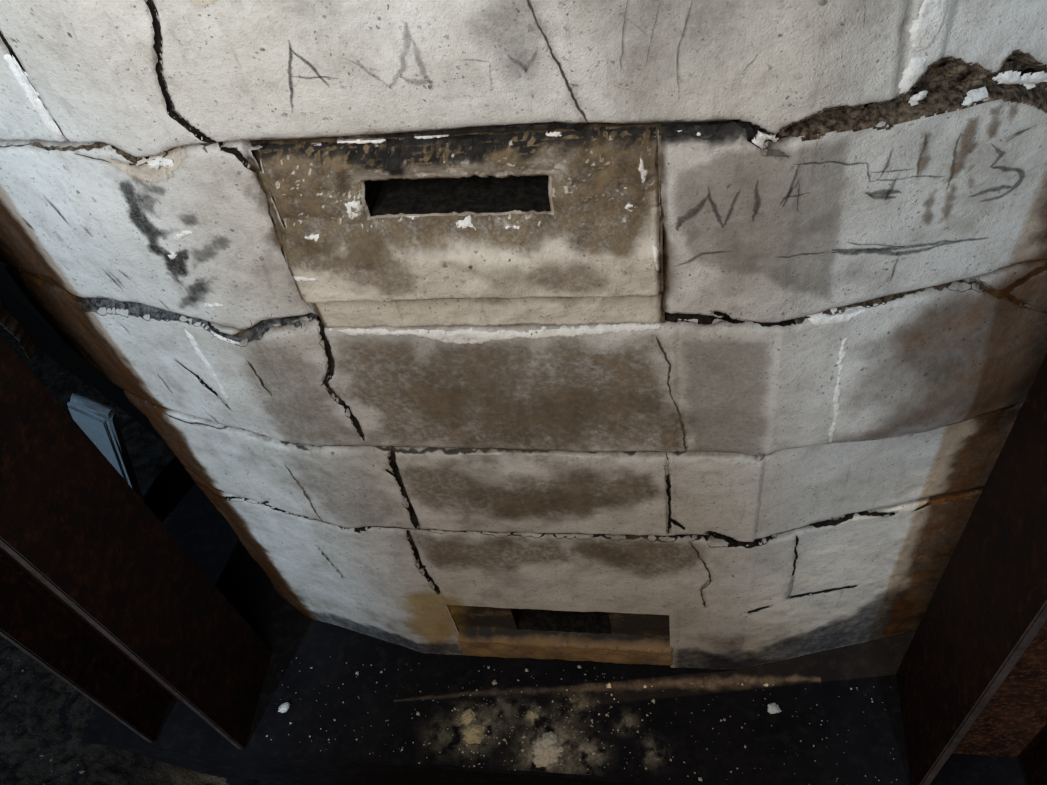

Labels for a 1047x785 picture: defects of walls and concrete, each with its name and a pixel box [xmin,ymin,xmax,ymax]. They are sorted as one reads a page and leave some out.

crack [0,32,69,141]
crack [144,0,292,276]
peeling [337,135,387,146]
crack [527,0,588,123]
spalling [752,0,1047,149]
damp [254,123,658,293]
crack [175,360,230,409]
crack [307,303,364,441]
damp [349,344,685,450]
crack [386,446,440,595]
damp [405,468,654,518]
crack [748,502,931,614]